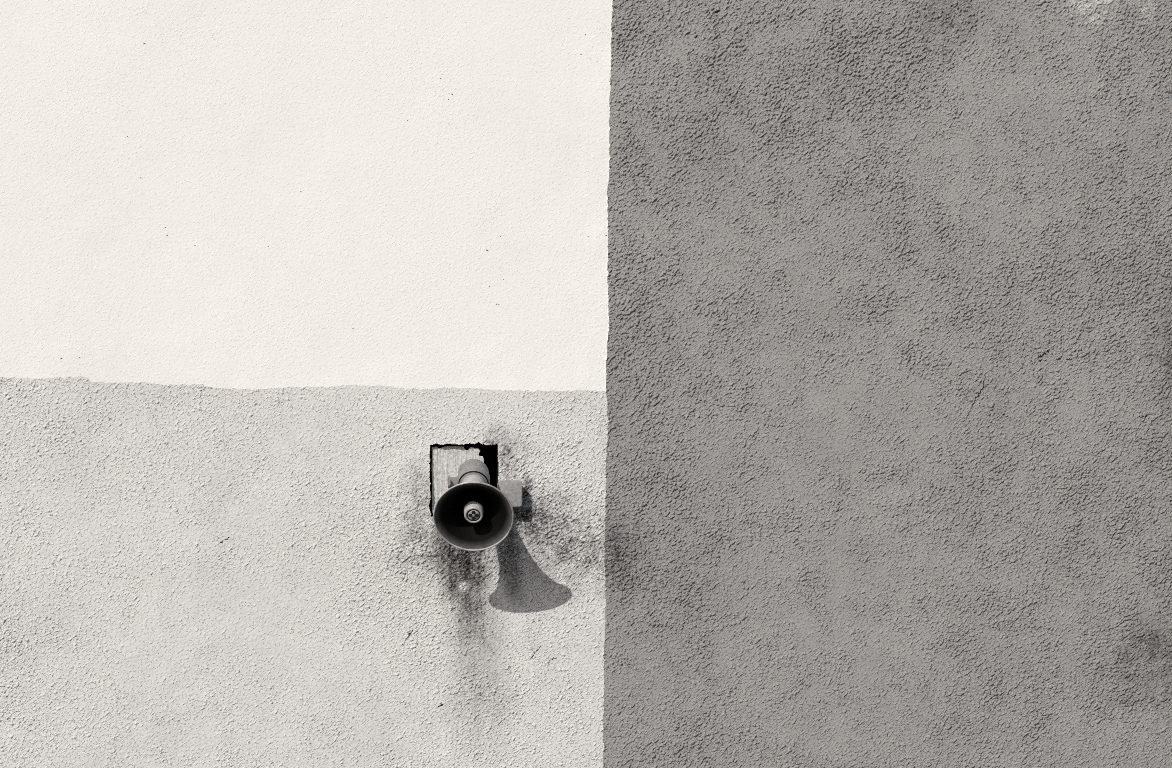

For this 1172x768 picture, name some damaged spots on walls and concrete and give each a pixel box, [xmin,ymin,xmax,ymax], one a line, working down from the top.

damp [443,544,484,615]